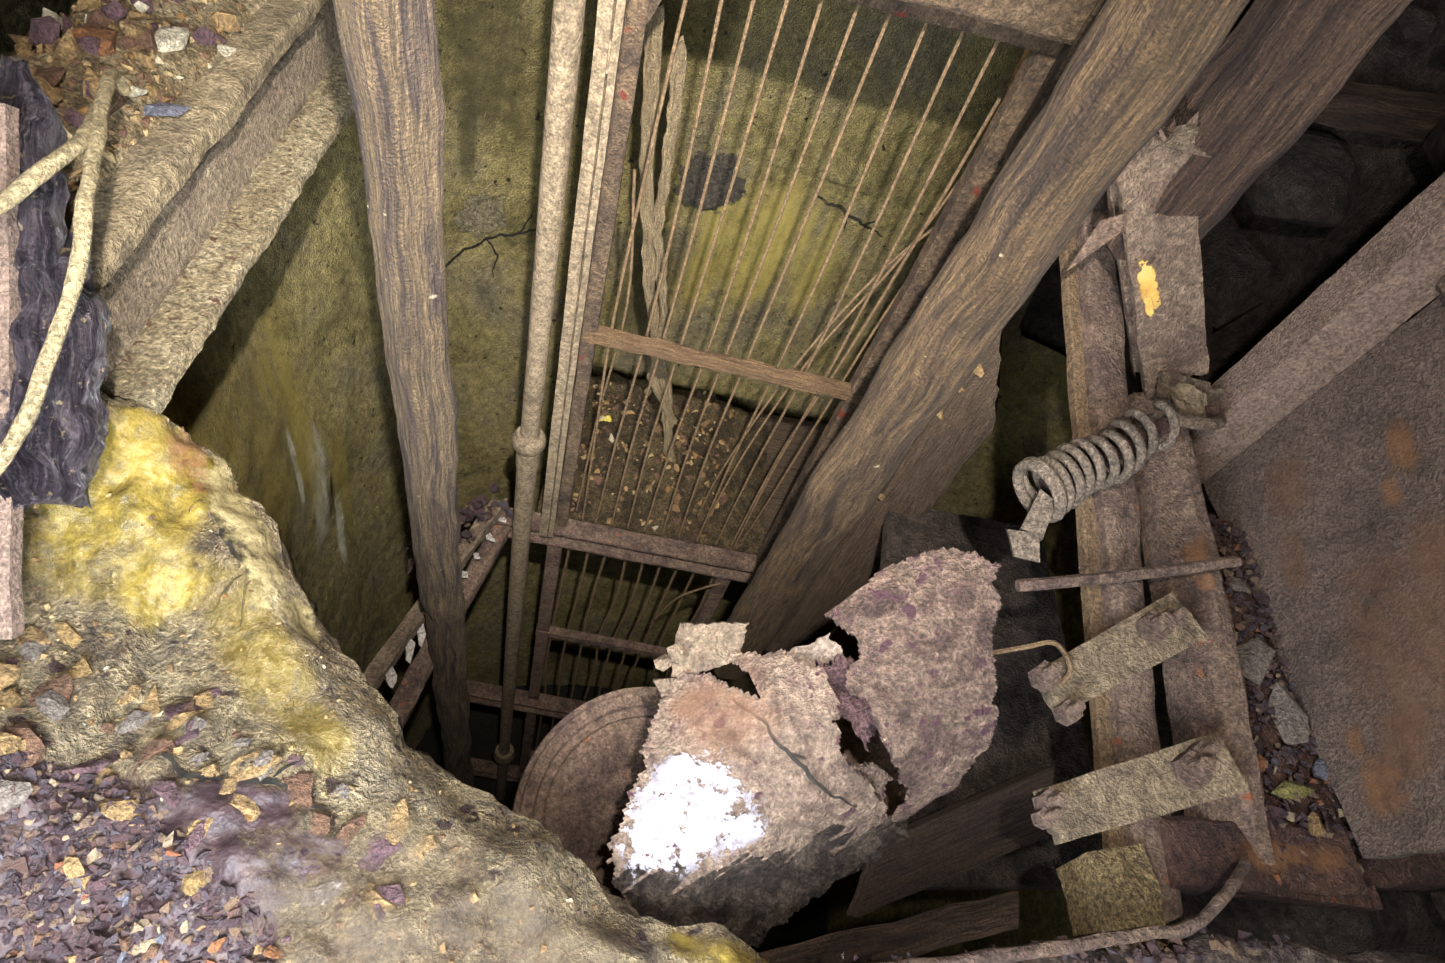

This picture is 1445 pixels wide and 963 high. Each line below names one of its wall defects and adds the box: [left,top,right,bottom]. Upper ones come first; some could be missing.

crack [445,212,536,277]
crack [817,196,883,237]